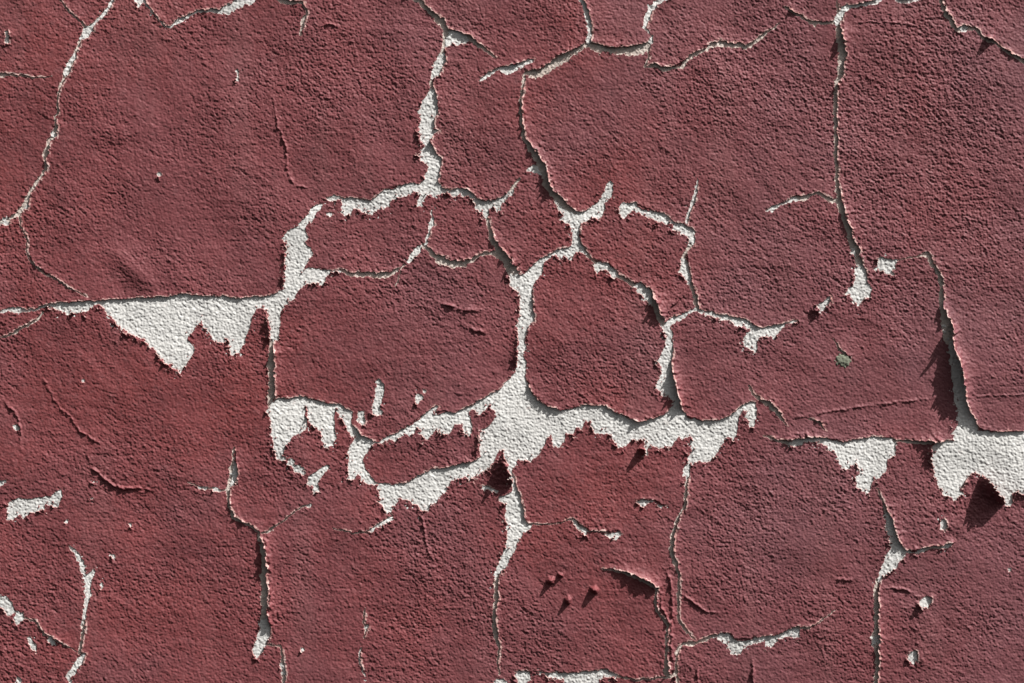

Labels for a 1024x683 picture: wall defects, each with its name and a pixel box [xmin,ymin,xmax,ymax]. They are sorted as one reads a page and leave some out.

crack [25,545,105,683]
crack [0,0,308,297]
crack [188,447,312,683]
crack [358,609,368,681]
peeling [0,0,798,683]
crack [395,209,501,287]
crack [528,518,623,540]
crack [602,477,836,683]
crack [479,0,1024,306]
crack [748,385,826,430]
peeling [763,251,1024,683]